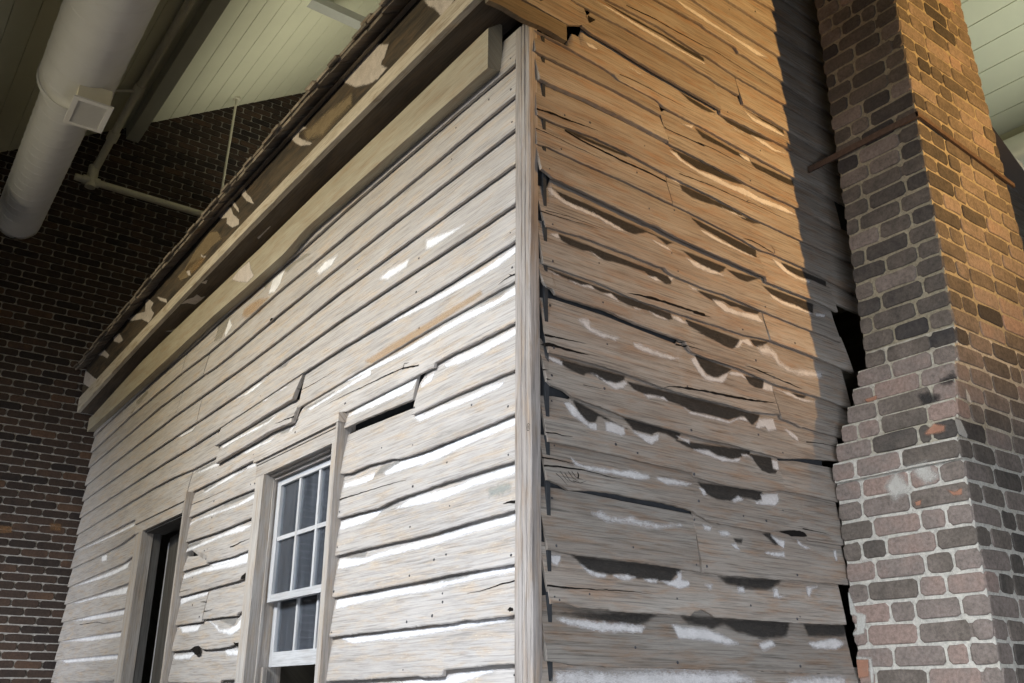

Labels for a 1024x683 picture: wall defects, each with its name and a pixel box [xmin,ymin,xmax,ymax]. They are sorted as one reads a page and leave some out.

peeling [291,42,388,146]
peeling [178,189,254,304]
peeling [129,297,167,323]
crack [629,293,710,317]
crack [338,362,419,399]
crack [664,366,802,403]